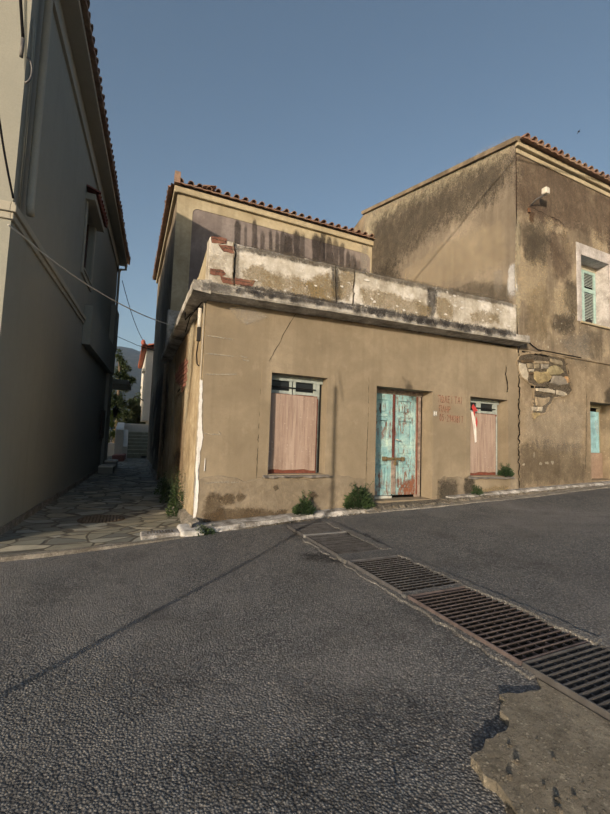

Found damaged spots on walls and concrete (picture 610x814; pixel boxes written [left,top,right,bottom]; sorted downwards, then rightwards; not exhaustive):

flaking render [211,236,234,254]
leakage [210,150,610,336]
peeling [210,265,504,323]
spalling [516,346,574,420]